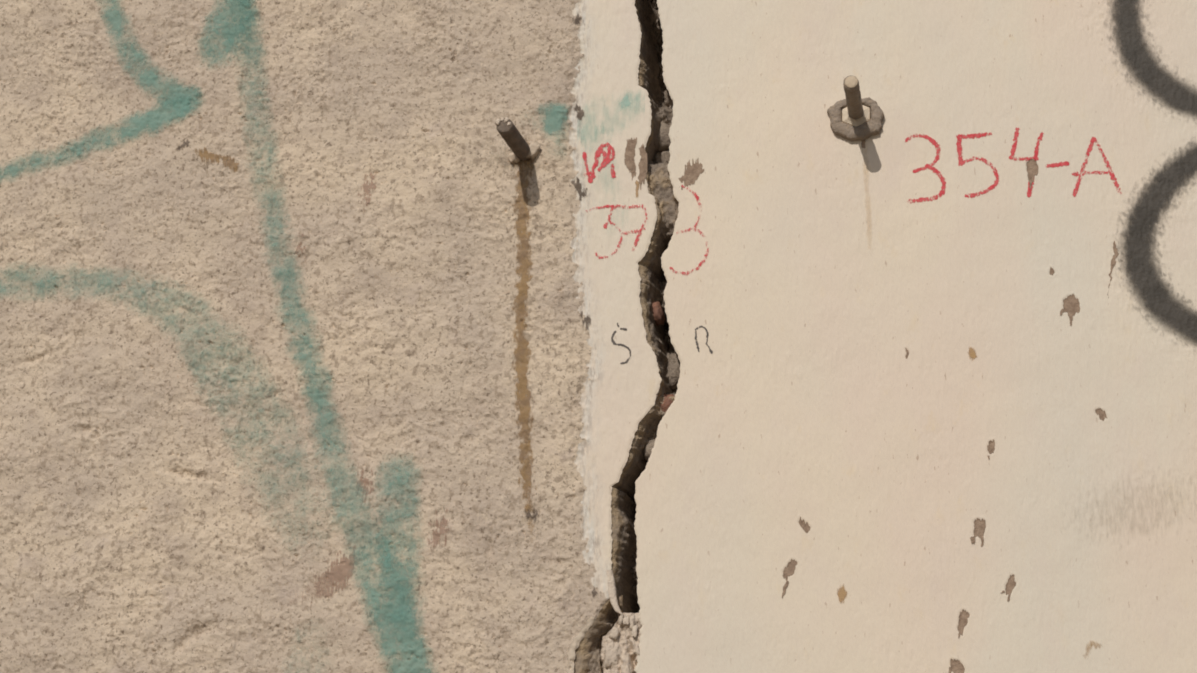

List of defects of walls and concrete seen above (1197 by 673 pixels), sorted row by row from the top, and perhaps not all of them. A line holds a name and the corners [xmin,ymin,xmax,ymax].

peeling [1060,294,1080,325]
corrosion [513,158,533,511]
crack [567,0,680,673]
peeling [970,518,986,547]
peeling [782,559,797,598]
peeling [1002,575,1016,601]
peeling [957,609,969,638]
spalling [599,613,642,673]
peeling [948,659,965,673]